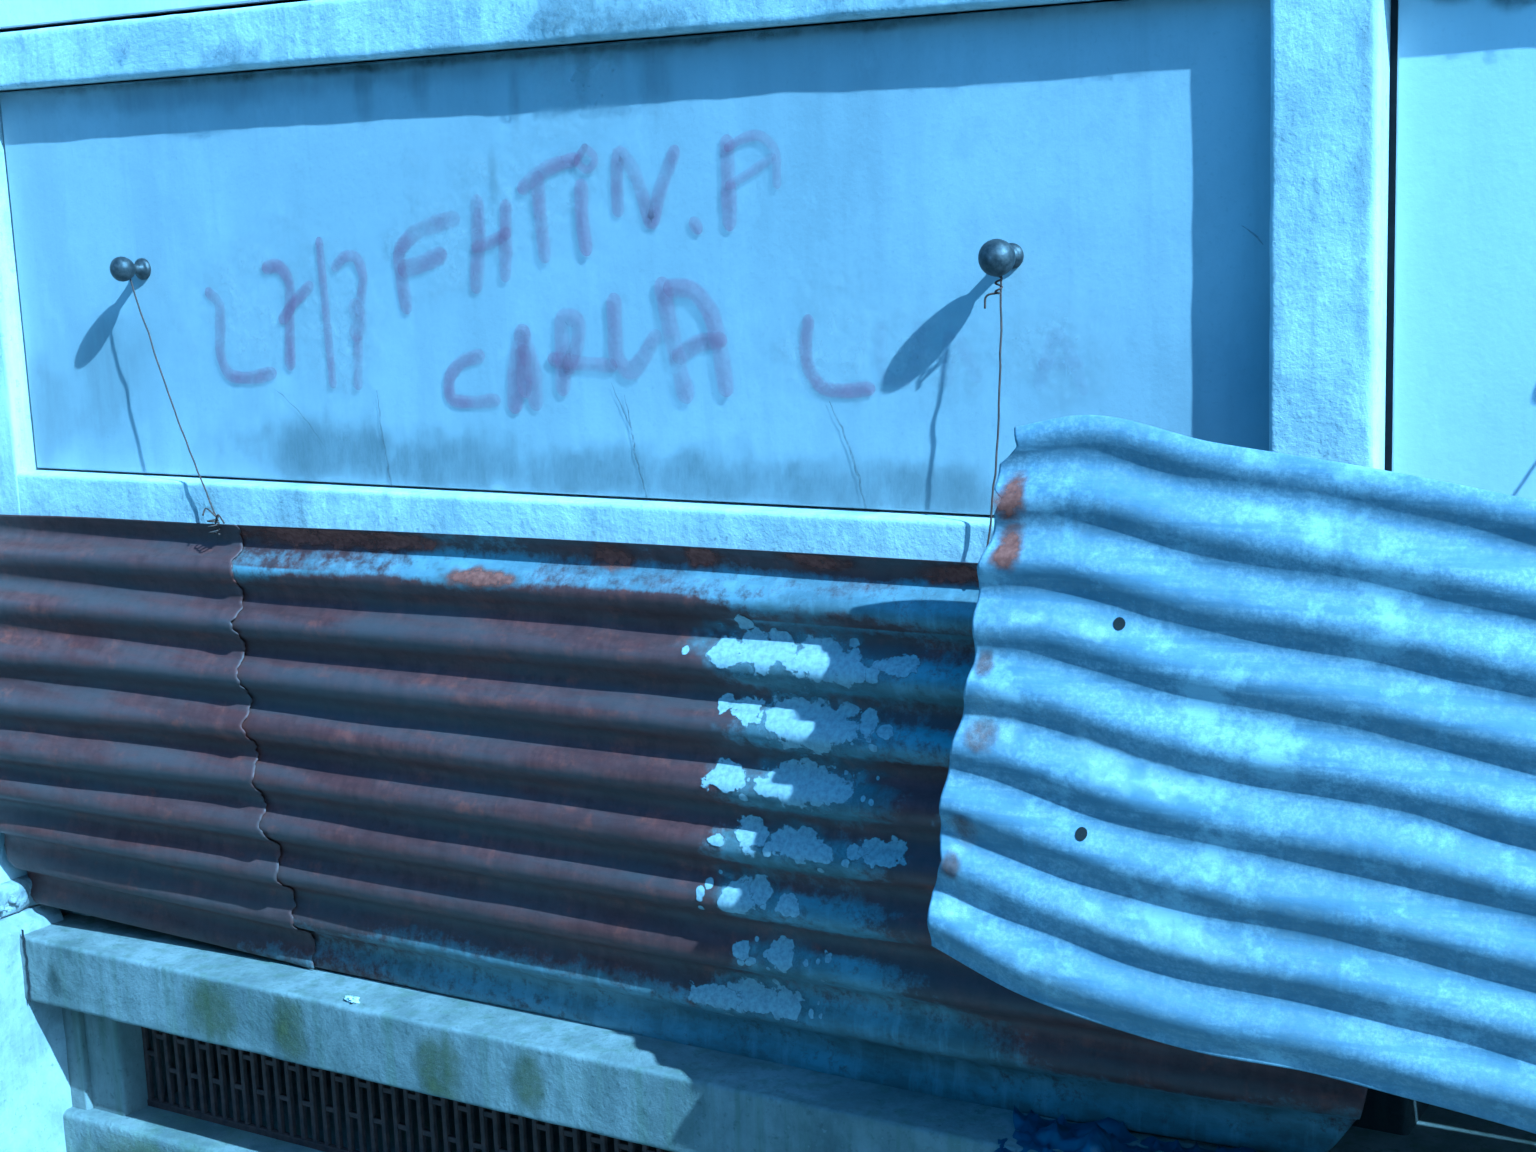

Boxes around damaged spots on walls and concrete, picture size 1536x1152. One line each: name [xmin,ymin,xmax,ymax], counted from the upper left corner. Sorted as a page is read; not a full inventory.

corrosion [240,527,443,552]
corrosion [925,476,1024,585]
peeling [682,614,921,1024]
crack [21,929,31,1002]